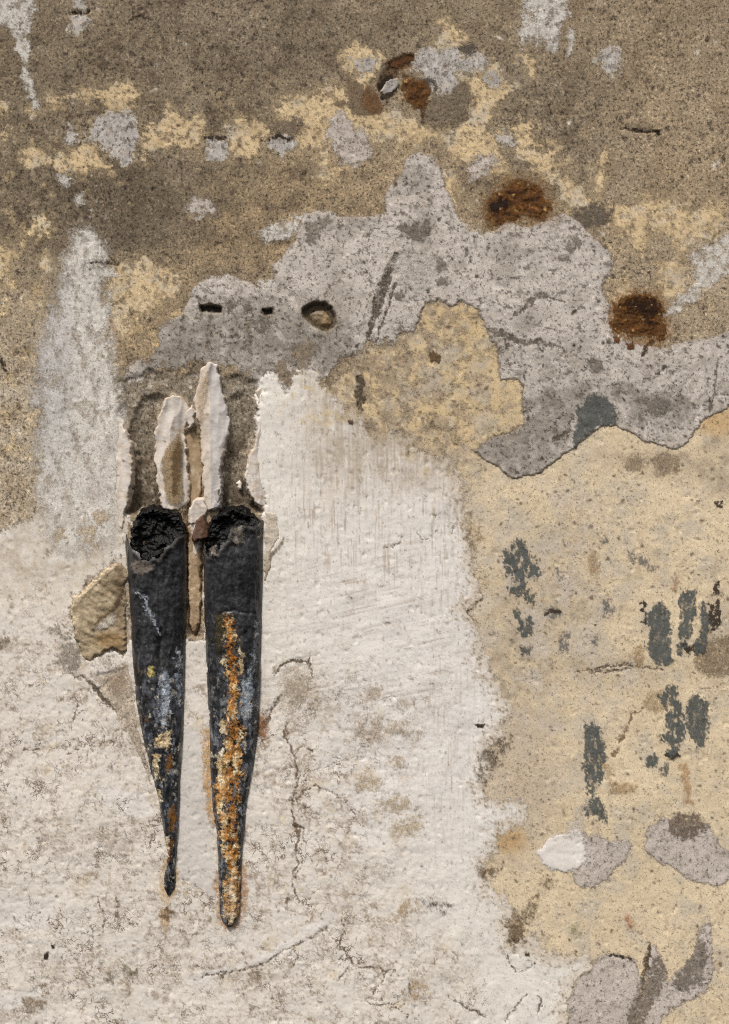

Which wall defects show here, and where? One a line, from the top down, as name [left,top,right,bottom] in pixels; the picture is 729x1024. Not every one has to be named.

rust [361,52,431,124]
rust [484,178,556,228]
rust [608,289,670,350]
peeling [153,362,231,534]
peeling [243,424,265,508]
rust [200,612,269,929]
crack [263,657,355,904]
rust [158,805,177,931]